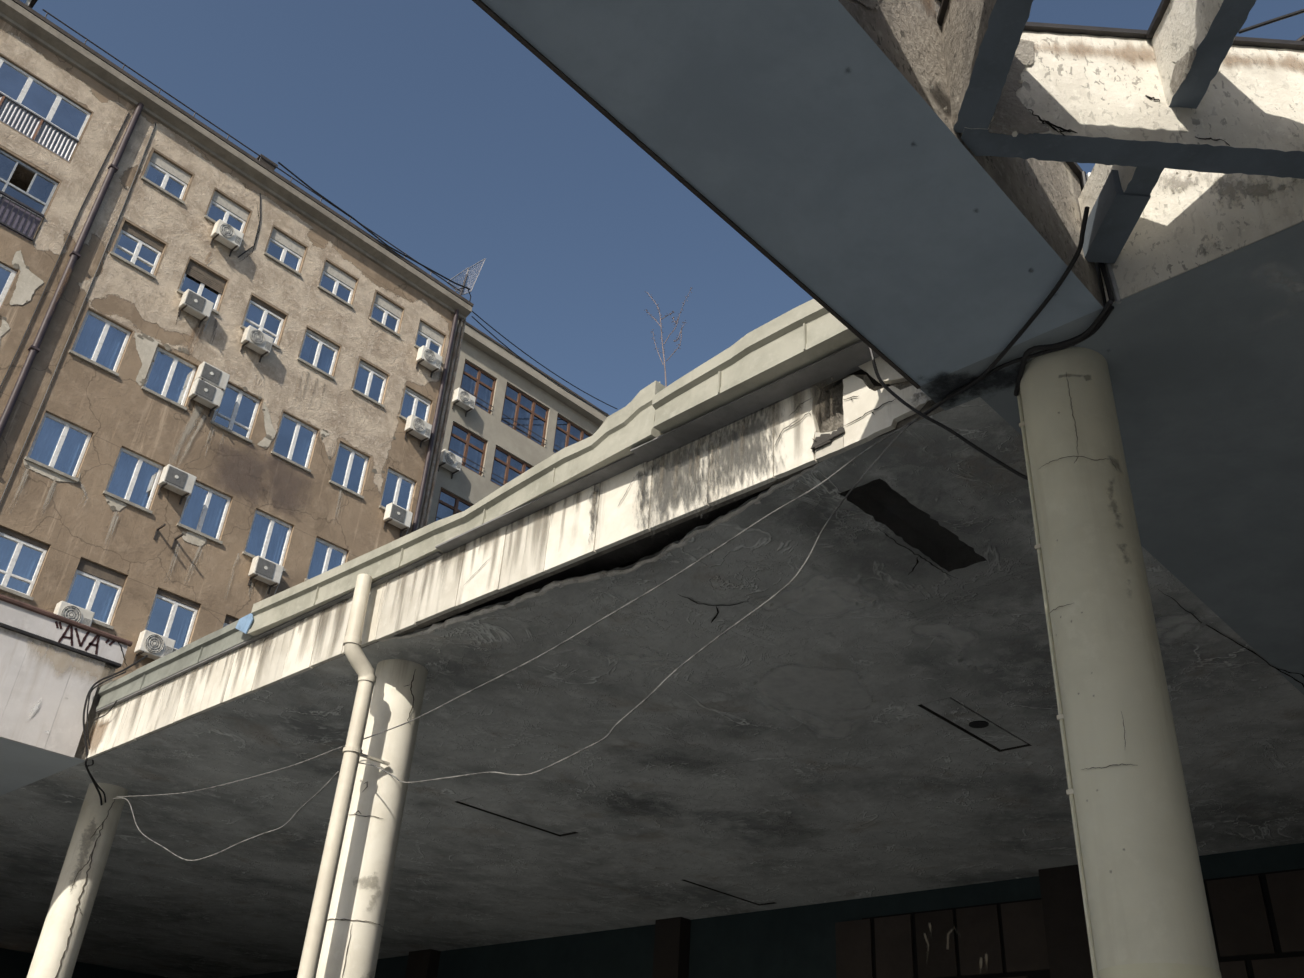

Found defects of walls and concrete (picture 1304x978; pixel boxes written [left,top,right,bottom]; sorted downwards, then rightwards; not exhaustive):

peeling [988,39,1049,137]
spalling [1170,46,1197,93]
peeling [0,31,450,493]
water stain [636,404,777,527]
crack [1039,372,1117,470]
crack [678,594,749,623]
crack [406,669,416,723]
crack [55,800,115,978]
crack [327,919,380,978]